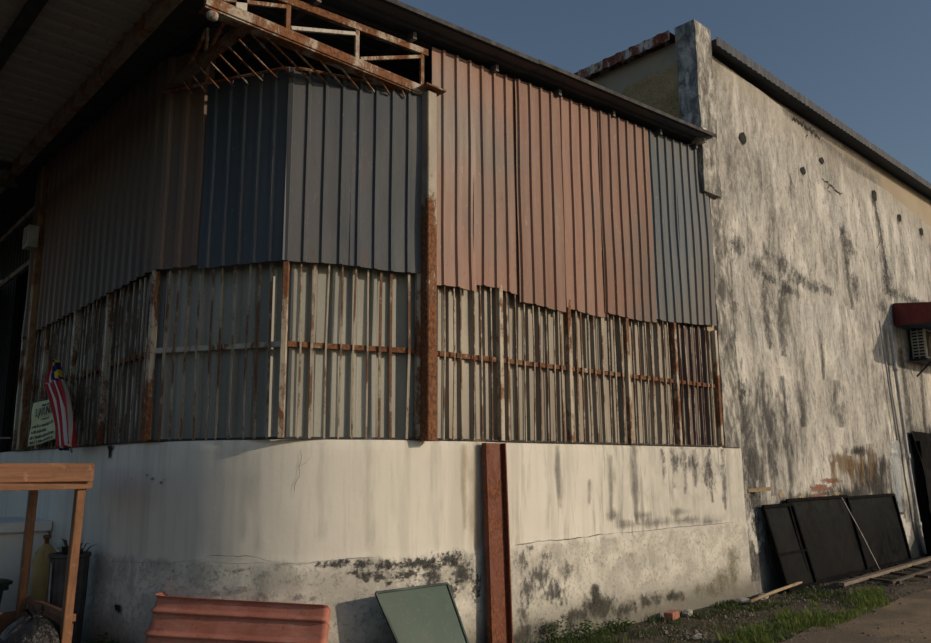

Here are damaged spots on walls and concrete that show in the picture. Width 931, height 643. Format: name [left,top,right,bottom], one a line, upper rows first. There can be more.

water stain [729,236,744,339]
water stain [750,243,836,371]
water stain [831,206,862,309]
water stain [798,383,806,427]
water stain [898,347,927,437]
water stain [633,442,659,525]
water stain [661,448,727,508]
water stain [738,374,794,582]
water stain [893,453,903,512]
water stain [513,546,685,643]